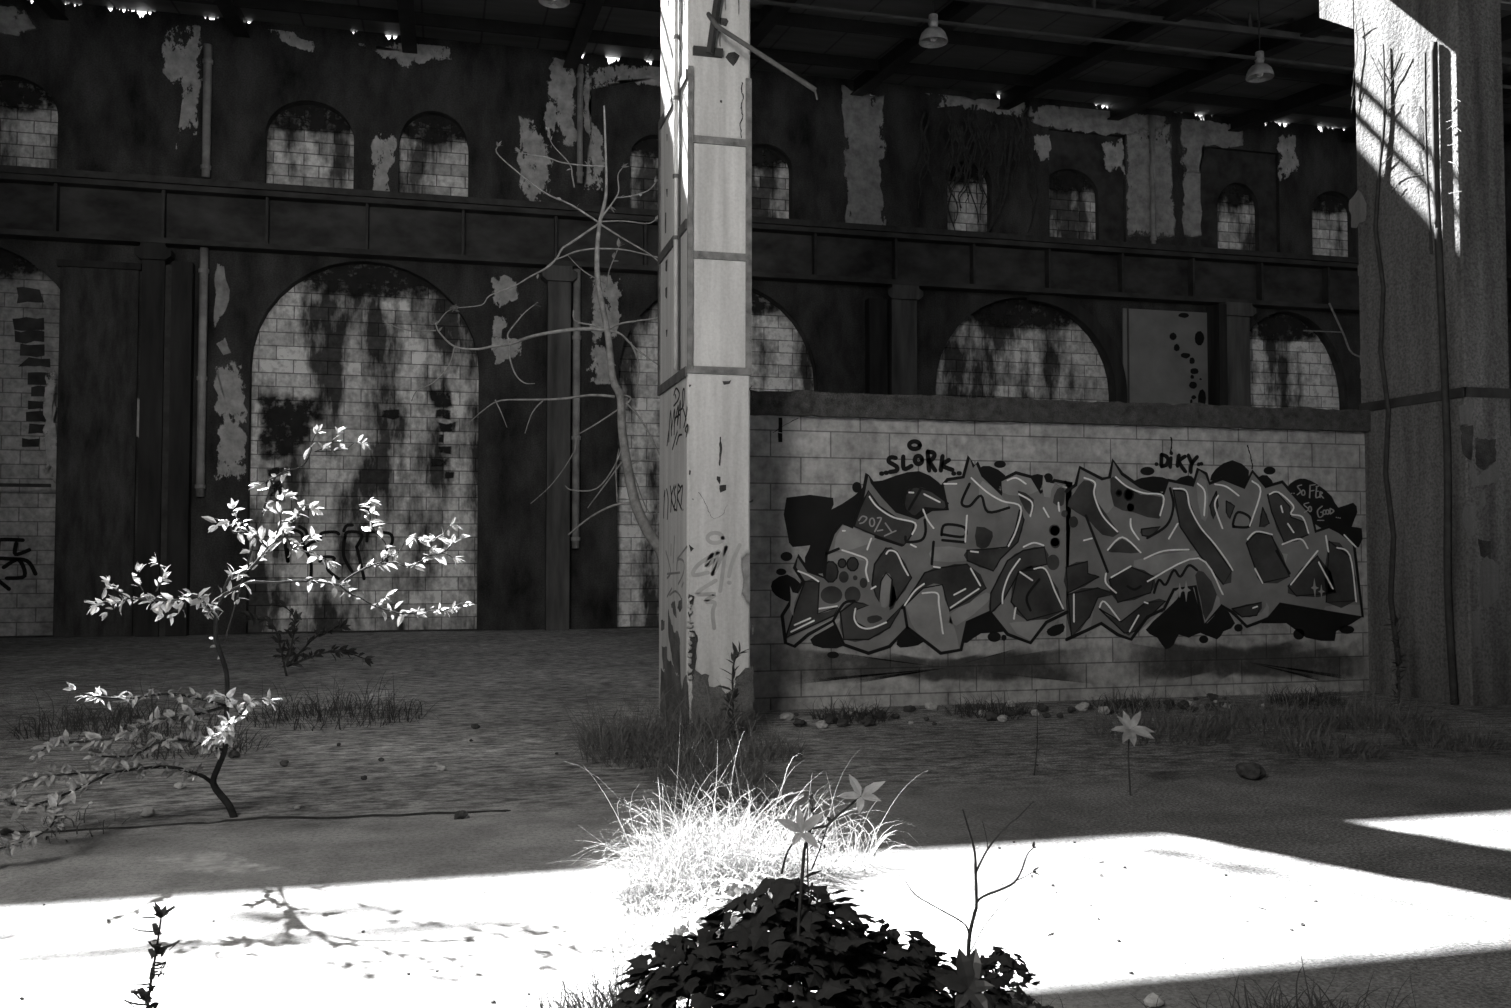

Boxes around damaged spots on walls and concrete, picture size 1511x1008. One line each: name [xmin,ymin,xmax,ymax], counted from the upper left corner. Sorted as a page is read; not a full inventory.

peeling [162,25,203,149]
peeling [517,47,668,202]
peeling [926,93,1244,237]
peeling [1277,134,1299,181]
peeling [491,275,522,365]
peeling [586,275,623,384]
peeling [43,371,57,482]